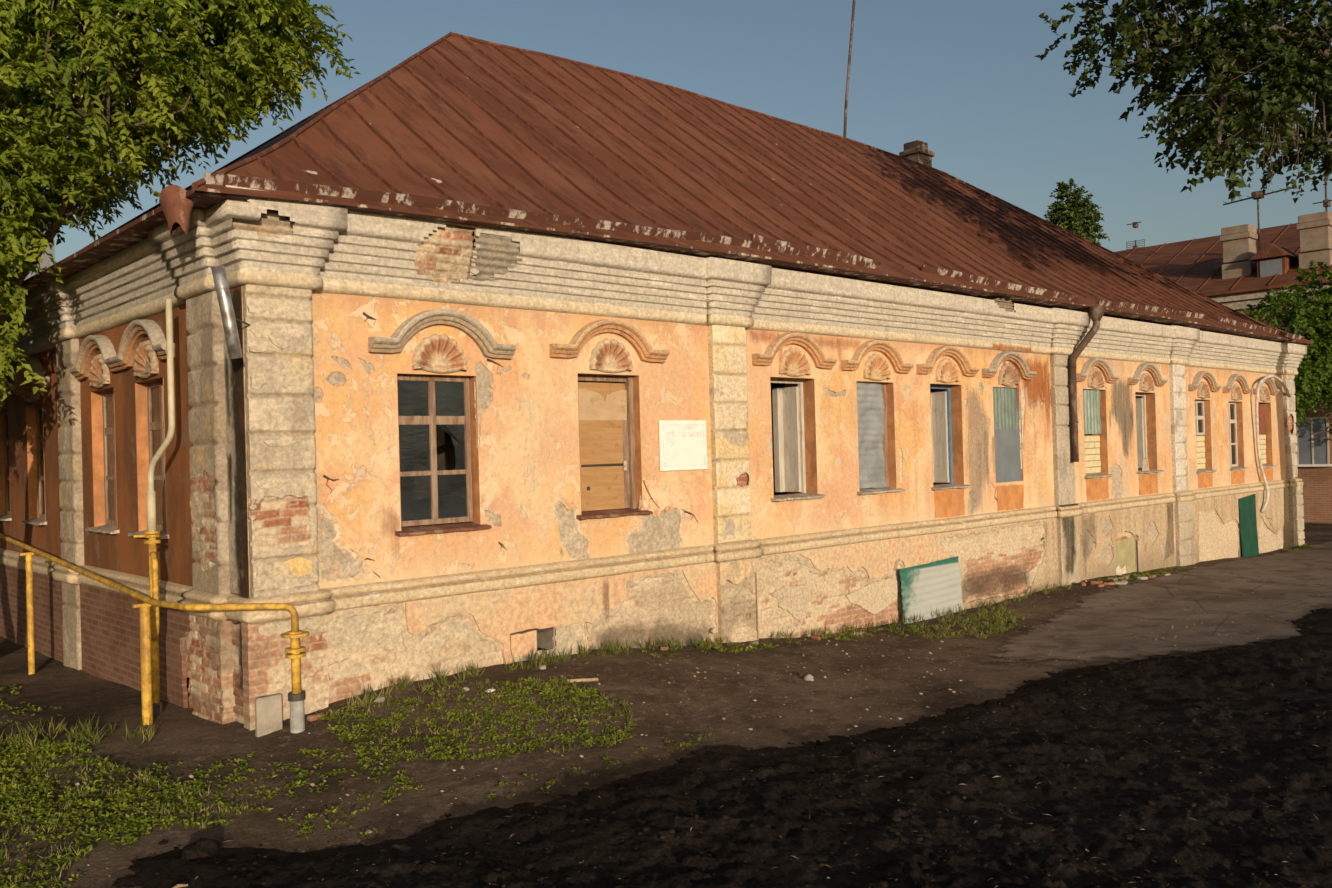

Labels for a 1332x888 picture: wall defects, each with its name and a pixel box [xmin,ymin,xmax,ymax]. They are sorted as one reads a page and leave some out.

flaking render [412,224,522,286]
flaking render [190,333,374,594]
flaking render [554,498,590,560]
flaking render [625,495,684,554]
flaking render [934,522,1046,602]
flaking render [185,554,904,731]